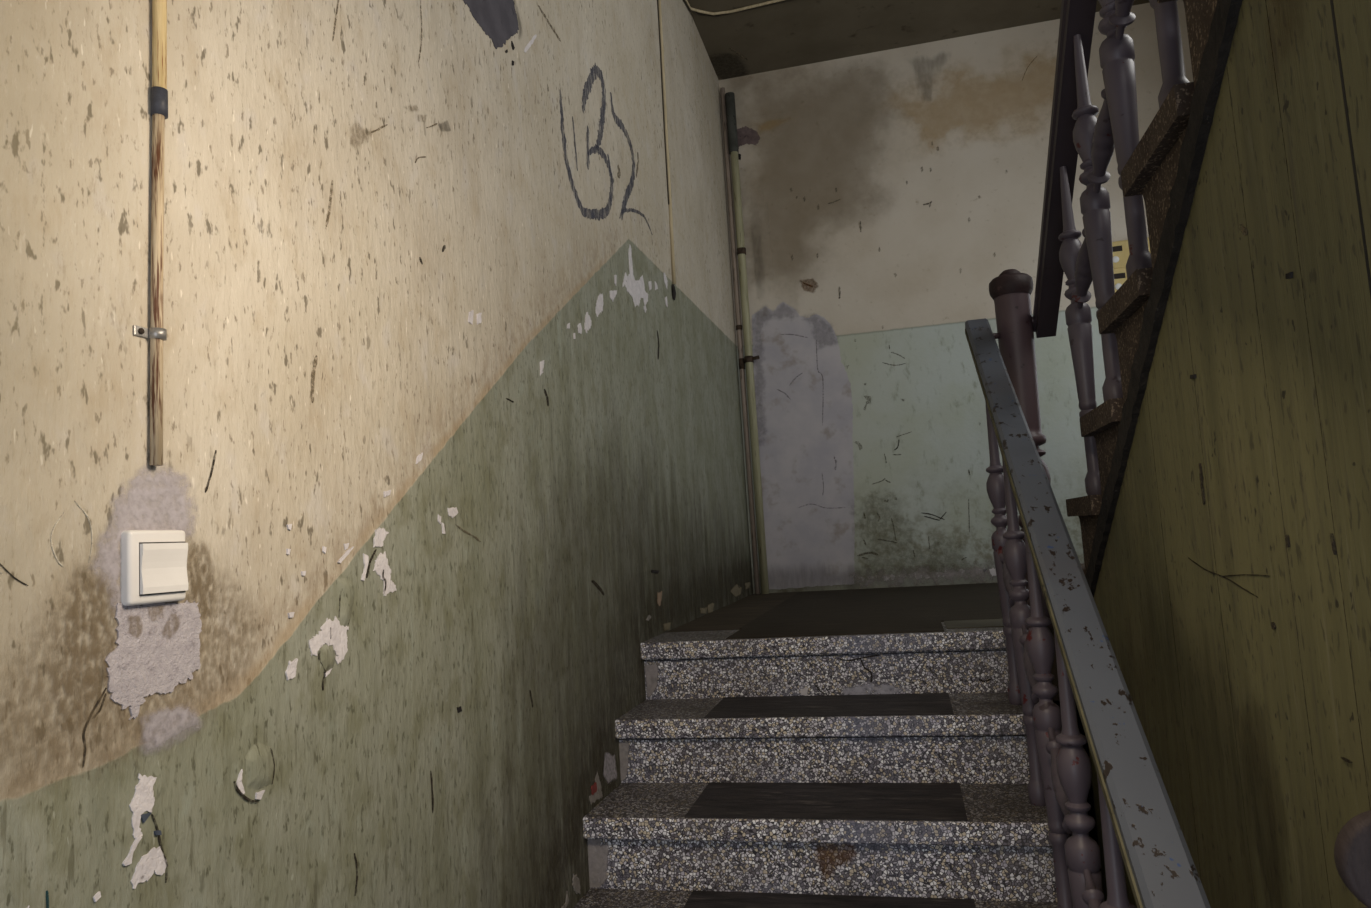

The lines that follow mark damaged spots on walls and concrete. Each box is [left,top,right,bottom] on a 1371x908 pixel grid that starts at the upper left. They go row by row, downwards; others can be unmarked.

peeling [567,245,668,339]
peeling [322,528,397,596]
peeling [437,507,481,542]
peeling [285,616,349,691]
leakage [82,688,107,767]
peeling [122,773,168,889]